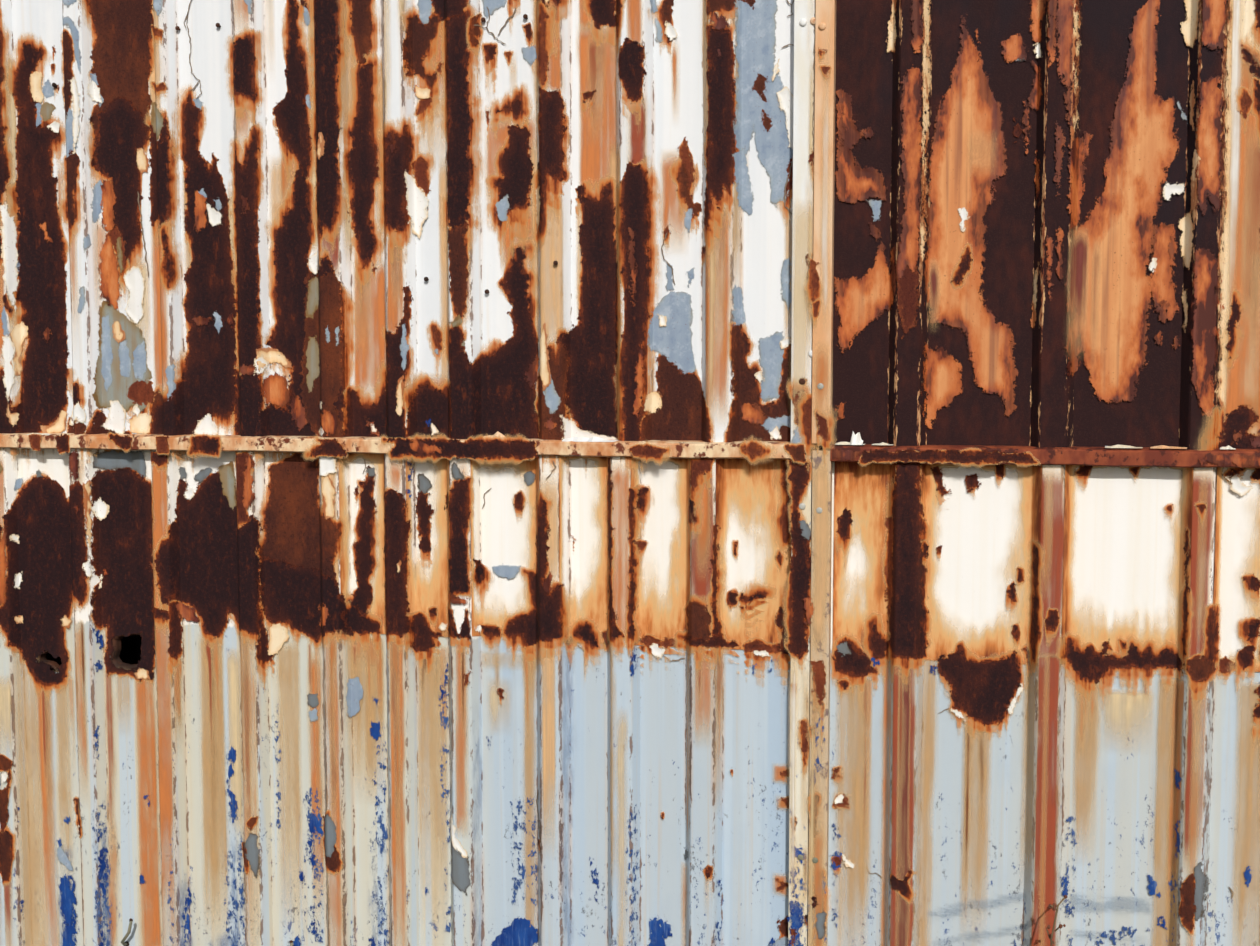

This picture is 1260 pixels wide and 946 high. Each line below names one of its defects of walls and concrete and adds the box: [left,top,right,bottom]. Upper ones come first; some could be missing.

peeling [710,0,793,215]
peeling [40,179,176,434]
peeling [627,227,638,307]
peeling [632,264,696,421]
peeling [731,285,746,326]
peeling [739,331,802,444]
rust [1070,236,1097,321]
rust [1201,0,1260,451]
peeling [68,450,146,588]
rust [0,0,834,946]